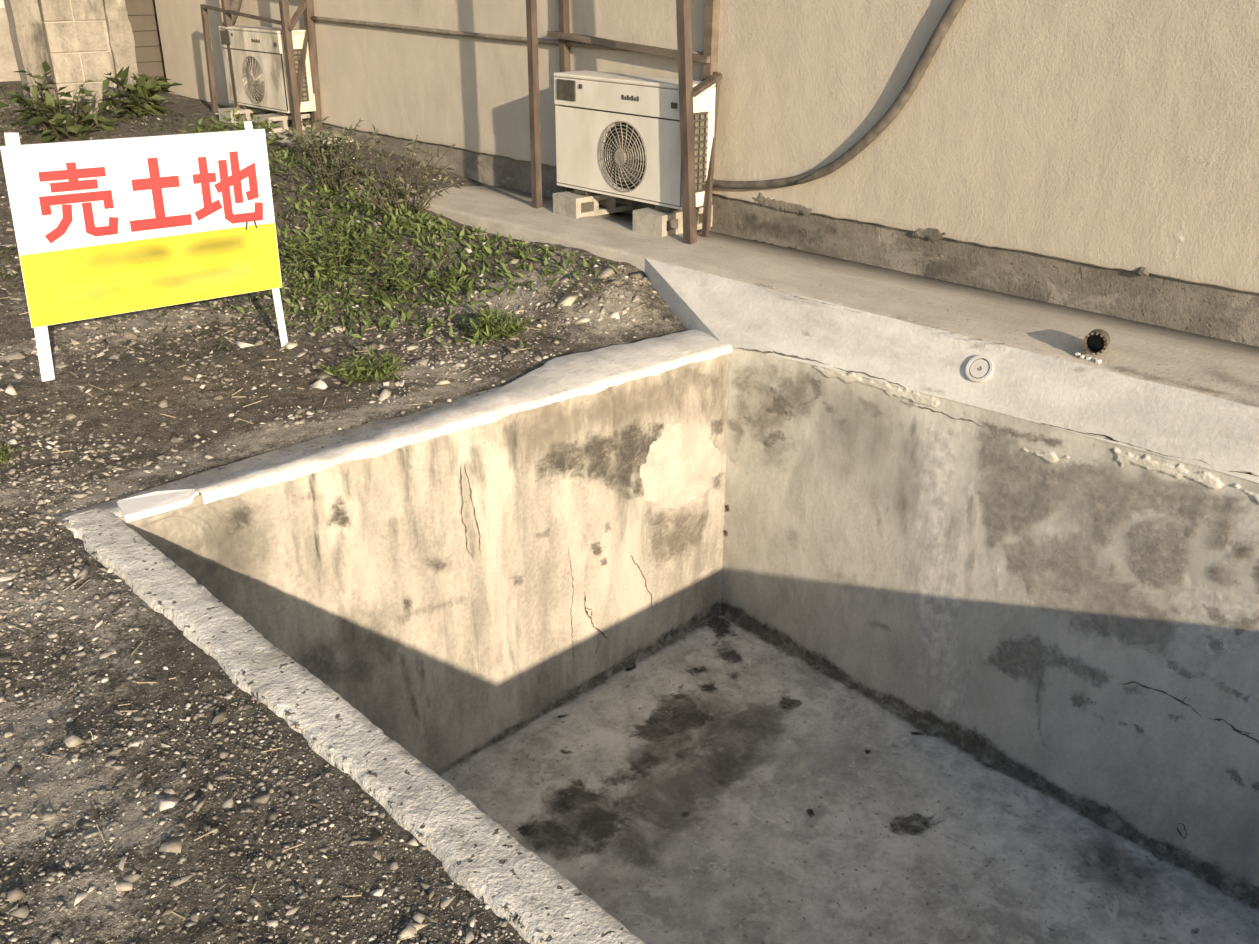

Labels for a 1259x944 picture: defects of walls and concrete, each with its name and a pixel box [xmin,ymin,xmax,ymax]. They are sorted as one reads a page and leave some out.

spalling [752,193,812,215]
spalling [912,228,946,241]
leakage [528,387,674,495]
crack [459,464,481,557]
crack [570,562,608,665]
spalling [53,258,1259,944]
leakage [492,429,1259,908]
crack [1119,681,1259,743]